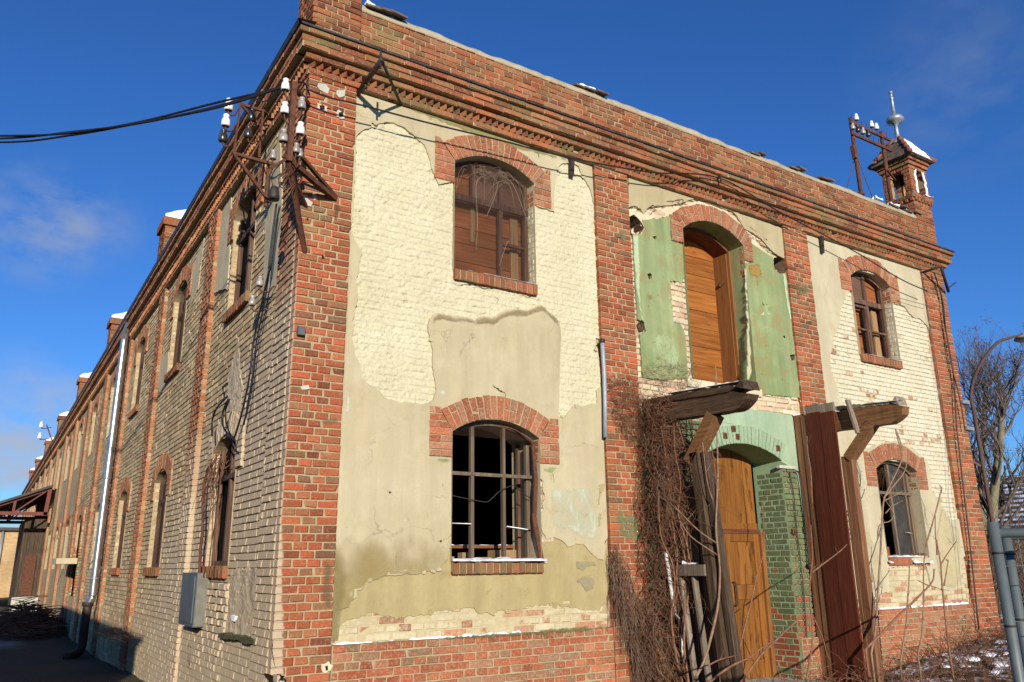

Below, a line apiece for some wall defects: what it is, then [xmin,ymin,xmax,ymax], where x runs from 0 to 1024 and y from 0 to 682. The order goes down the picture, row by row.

flaking render [351,121,601,418]
flaking render [669,278,688,330]
flaking render [629,201,785,274]
flaking render [638,377,693,406]
flaking render [743,396,801,417]
flaking render [830,291,958,520]
flaking render [331,533,611,644]
flaking render [874,557,971,610]